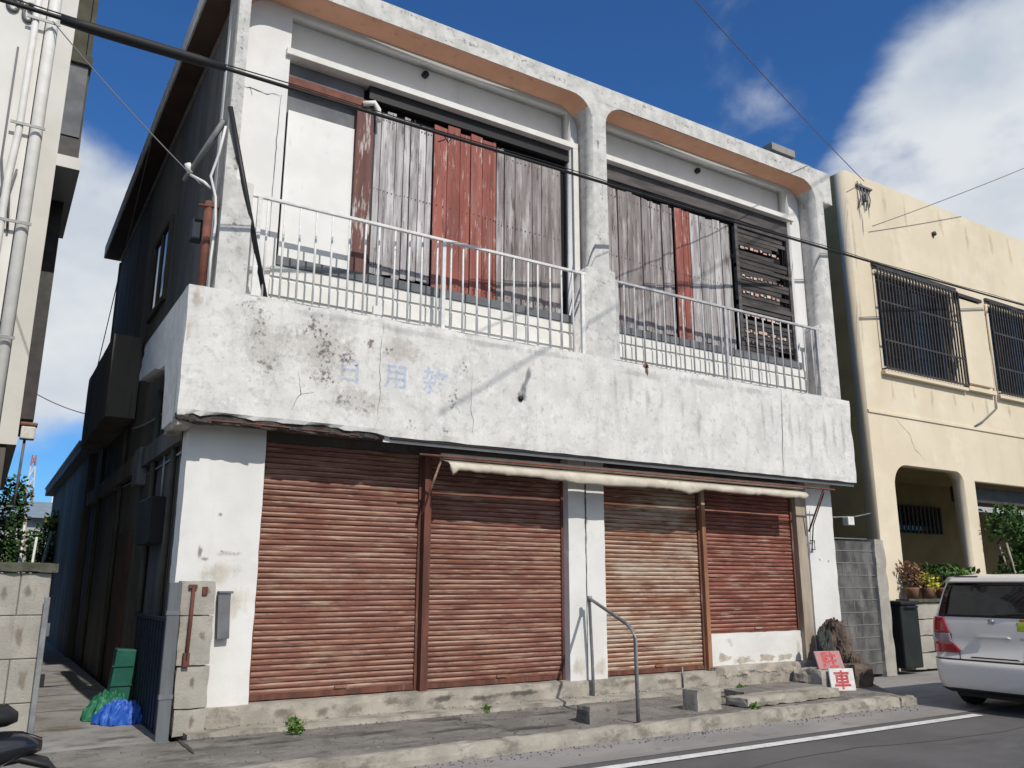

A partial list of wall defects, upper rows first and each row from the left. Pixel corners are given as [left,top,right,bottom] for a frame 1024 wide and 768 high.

spalling [164,413,385,441]